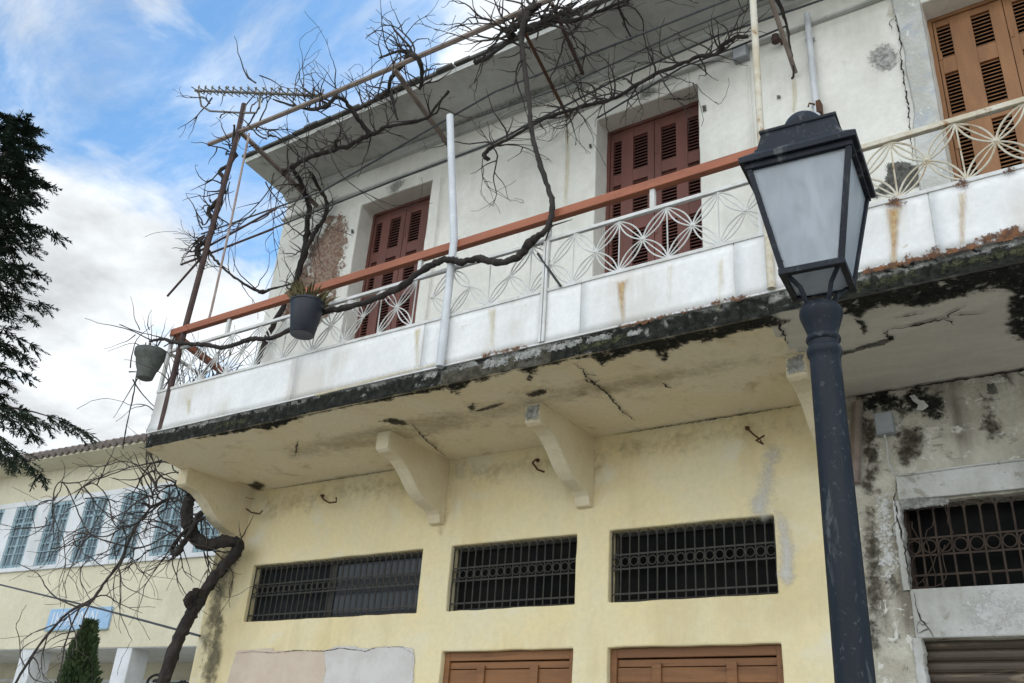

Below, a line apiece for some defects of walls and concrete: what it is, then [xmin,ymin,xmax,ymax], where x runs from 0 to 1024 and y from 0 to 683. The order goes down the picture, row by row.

spalling [868,41,900,73]
crack [889,10,913,157]
peeling [296,212,354,323]
corrosion [862,197,1024,276]
water stain [144,243,1024,448]
crack [882,306,984,337]
crack [577,365,799,435]
water stain [862,387,945,494]
water stain [204,555,236,683]
peeling [227,646,415,683]